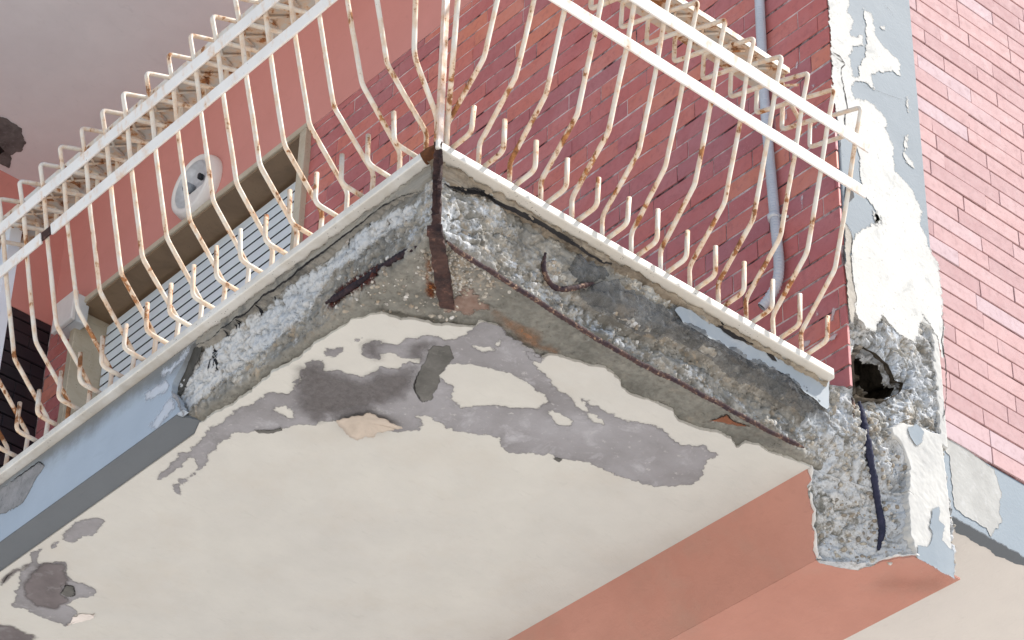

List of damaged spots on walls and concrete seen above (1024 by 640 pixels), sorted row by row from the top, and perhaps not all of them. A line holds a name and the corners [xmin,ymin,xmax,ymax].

peeling [828,0,945,359]
corrosion [327,264,379,308]
corrosion [444,286,490,315]
spalling [157,177,828,494]
spalling [0,461,44,514]
spalling [819,344,903,551]
peeling [945,439,1002,536]
peeling [11,518,105,626]